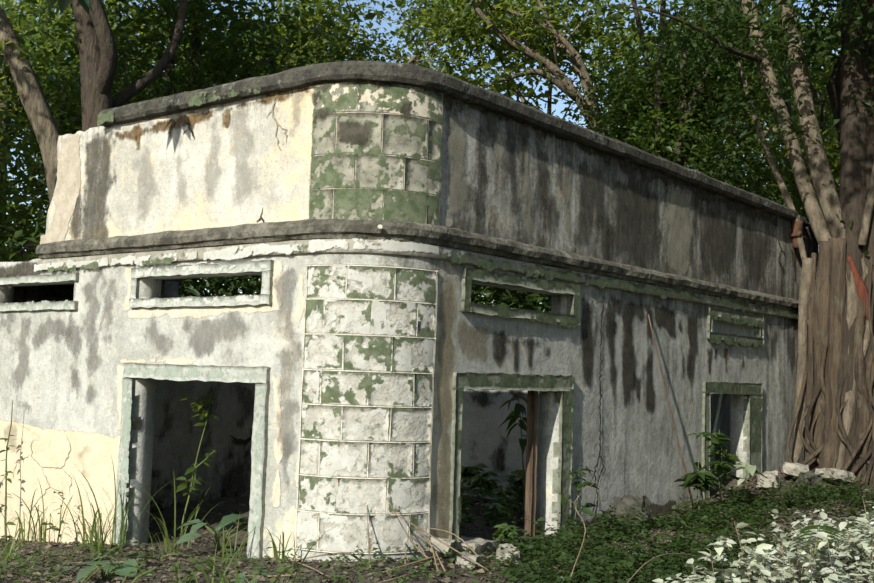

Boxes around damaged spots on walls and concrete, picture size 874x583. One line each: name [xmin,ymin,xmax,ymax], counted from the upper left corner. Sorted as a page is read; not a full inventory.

damp [70,131,115,239]
crack [267,95,287,149]
damp [312,82,330,123]
damp [358,82,392,100]
peeling [309,83,444,225]
damp [421,88,778,287]
damp [0,261,37,289]
damp [2,273,114,384]
damp [71,370,93,401]
peeling [253,265,438,561]
damp [581,296,717,412]
crack [12,435,72,508]